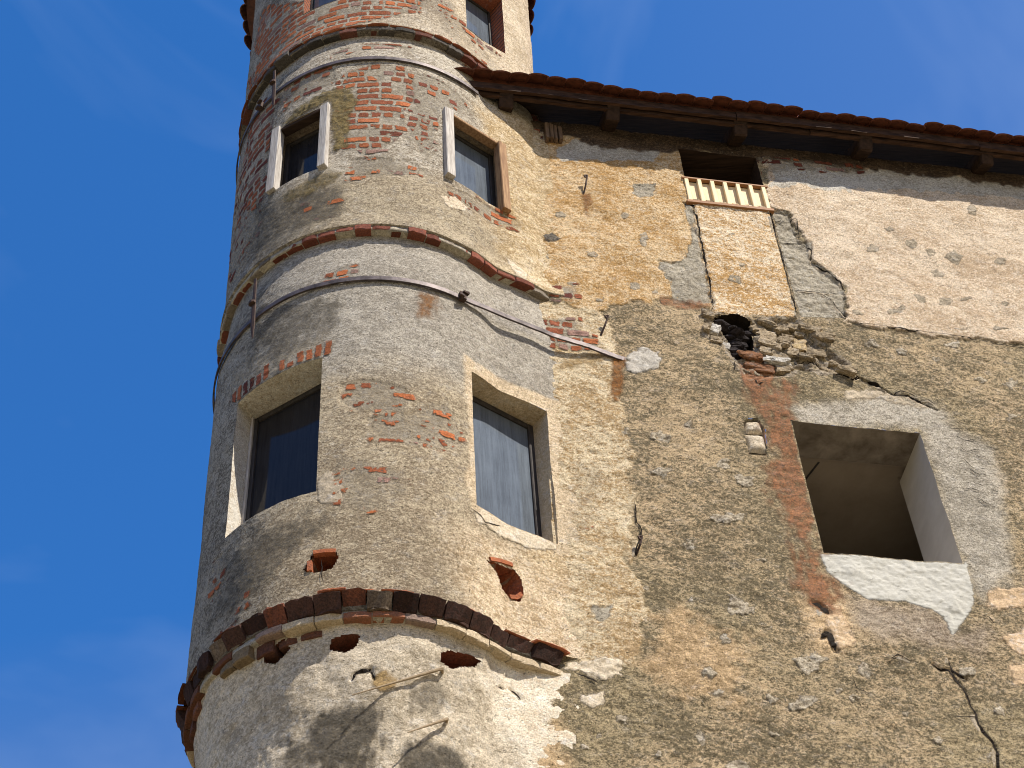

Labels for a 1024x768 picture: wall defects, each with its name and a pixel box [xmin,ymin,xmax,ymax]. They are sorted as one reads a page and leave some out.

spalling [228,43,471,282]
spalling [659,204,927,409]
crack [767,211,1024,348]
crack [632,501,642,557]
rust [741,356,841,611]
crack [799,362,998,504]
spalling [330,634,360,653]
spalling [440,650,481,669]
crack [935,658,1000,768]